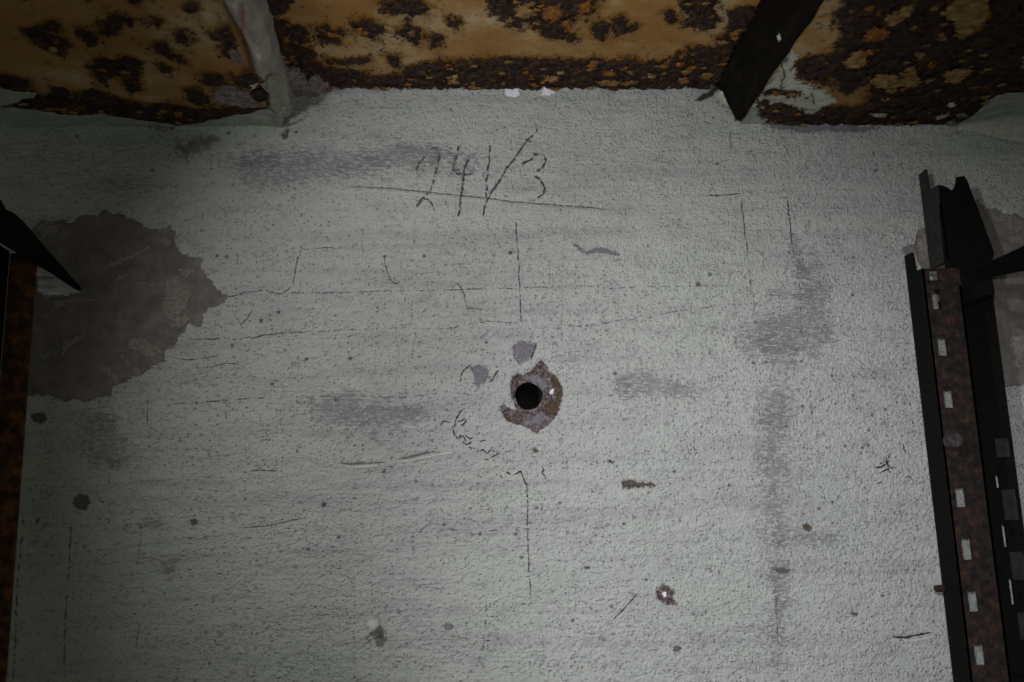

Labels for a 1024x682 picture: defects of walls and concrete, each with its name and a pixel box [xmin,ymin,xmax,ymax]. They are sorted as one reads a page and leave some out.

corrosion [0,0,267,131]
corrosion [267,0,758,91]
corrosion [755,0,1024,134]
corrosion [543,372,563,416]
crack [441,408,546,487]